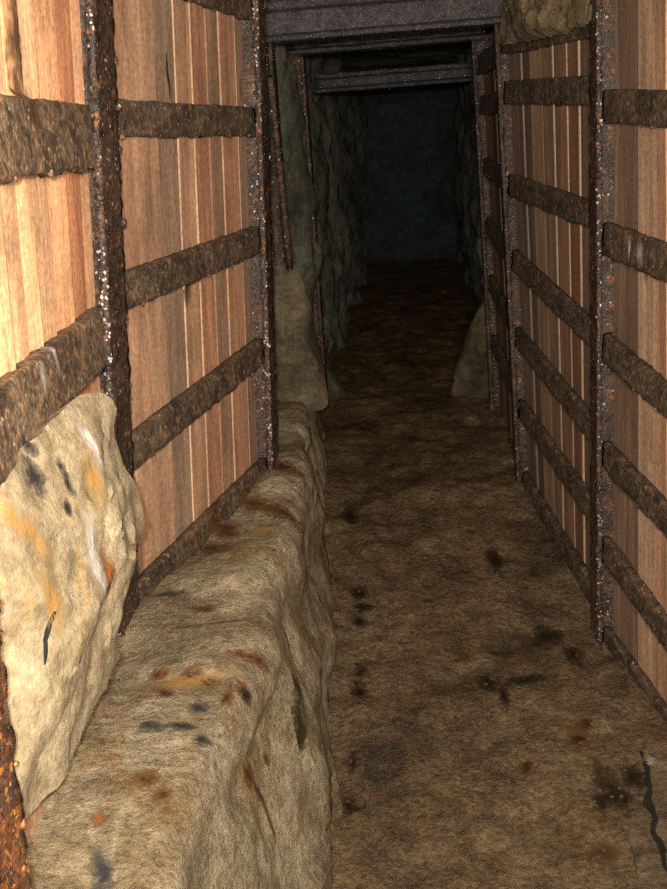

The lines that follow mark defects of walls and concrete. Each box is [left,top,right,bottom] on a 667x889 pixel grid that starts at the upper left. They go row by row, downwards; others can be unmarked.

crack [625,751,667,872]